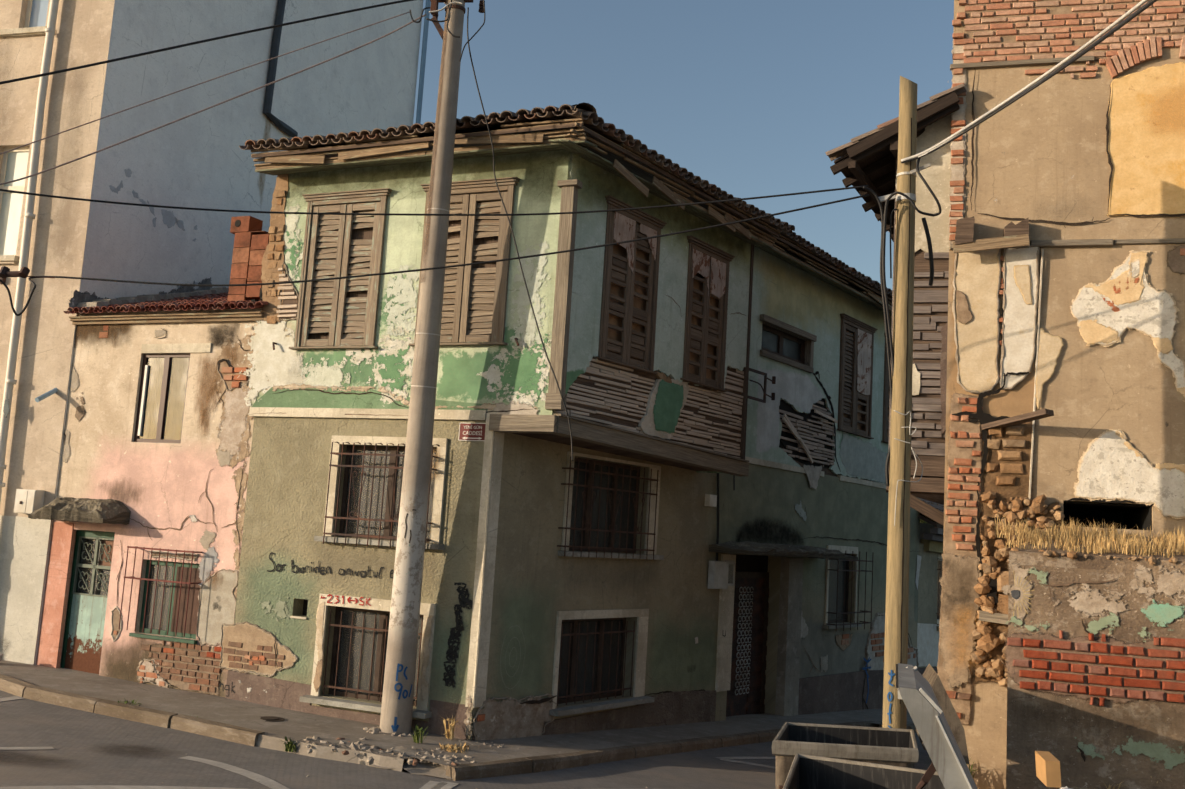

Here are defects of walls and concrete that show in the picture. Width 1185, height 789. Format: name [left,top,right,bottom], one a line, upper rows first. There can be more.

peeling [109,169,197,242]
crack [970,68,1110,309]
peeling [435,241,551,415]
flaking render [937,0,1185,725]
crack [116,445,248,597]
peeling [137,204,420,698]
spalling [463,693,557,741]
spalling [865,612,885,674]